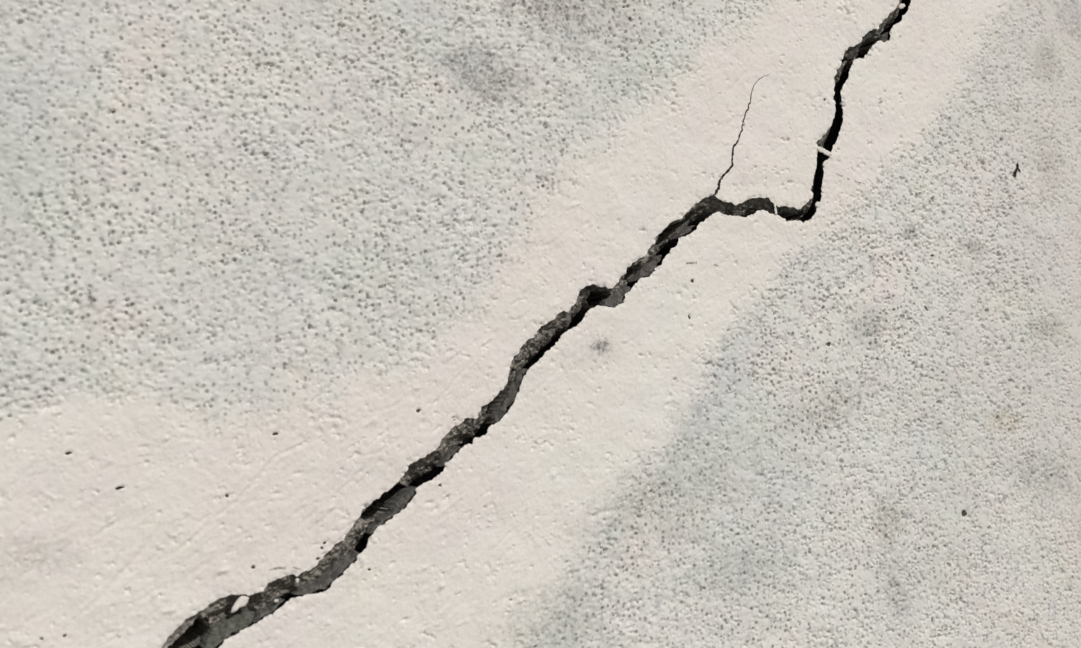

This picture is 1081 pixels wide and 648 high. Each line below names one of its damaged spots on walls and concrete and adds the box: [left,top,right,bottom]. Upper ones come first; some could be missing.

crack [833,0,905,99]
crack [162,74,865,648]